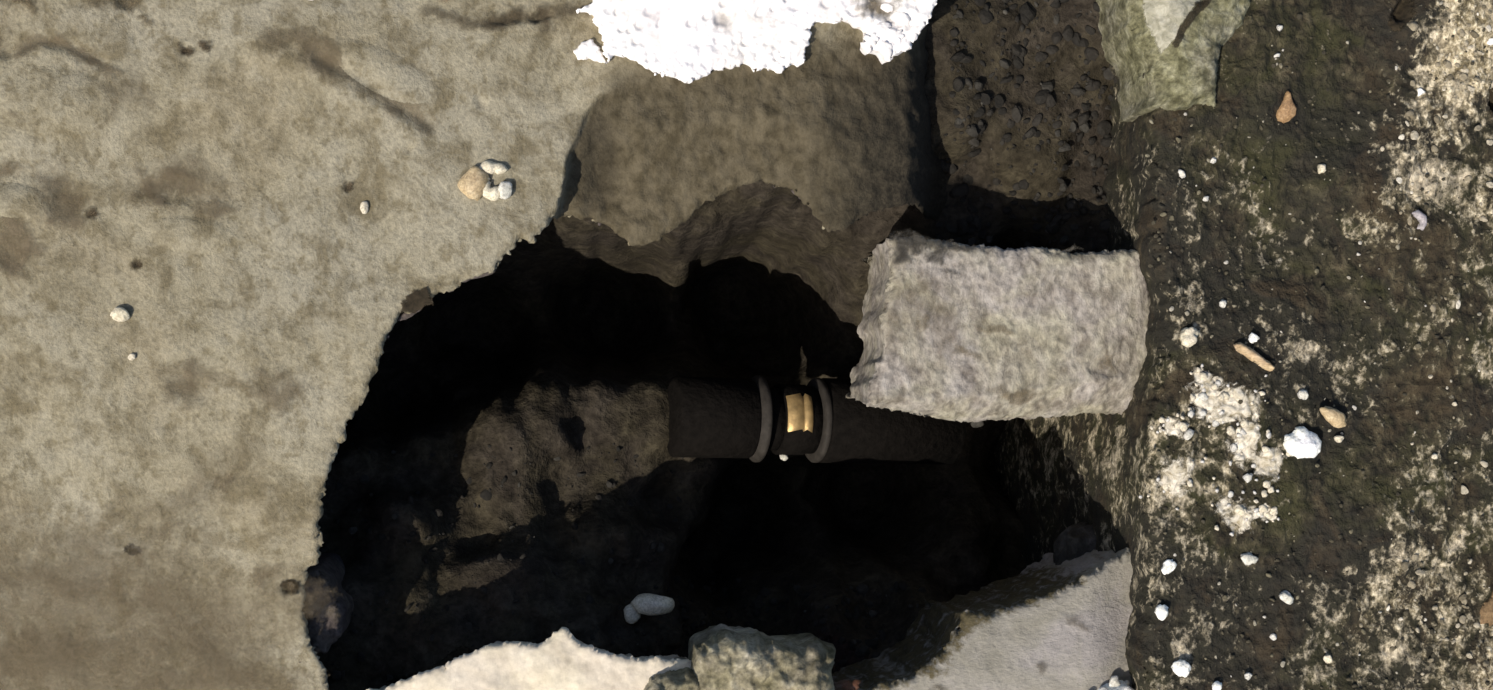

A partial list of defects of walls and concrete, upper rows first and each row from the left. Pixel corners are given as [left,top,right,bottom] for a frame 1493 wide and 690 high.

peeling [573,39,607,64]
spalling [386,261,501,338]
efflorescence [1139,364,1290,536]